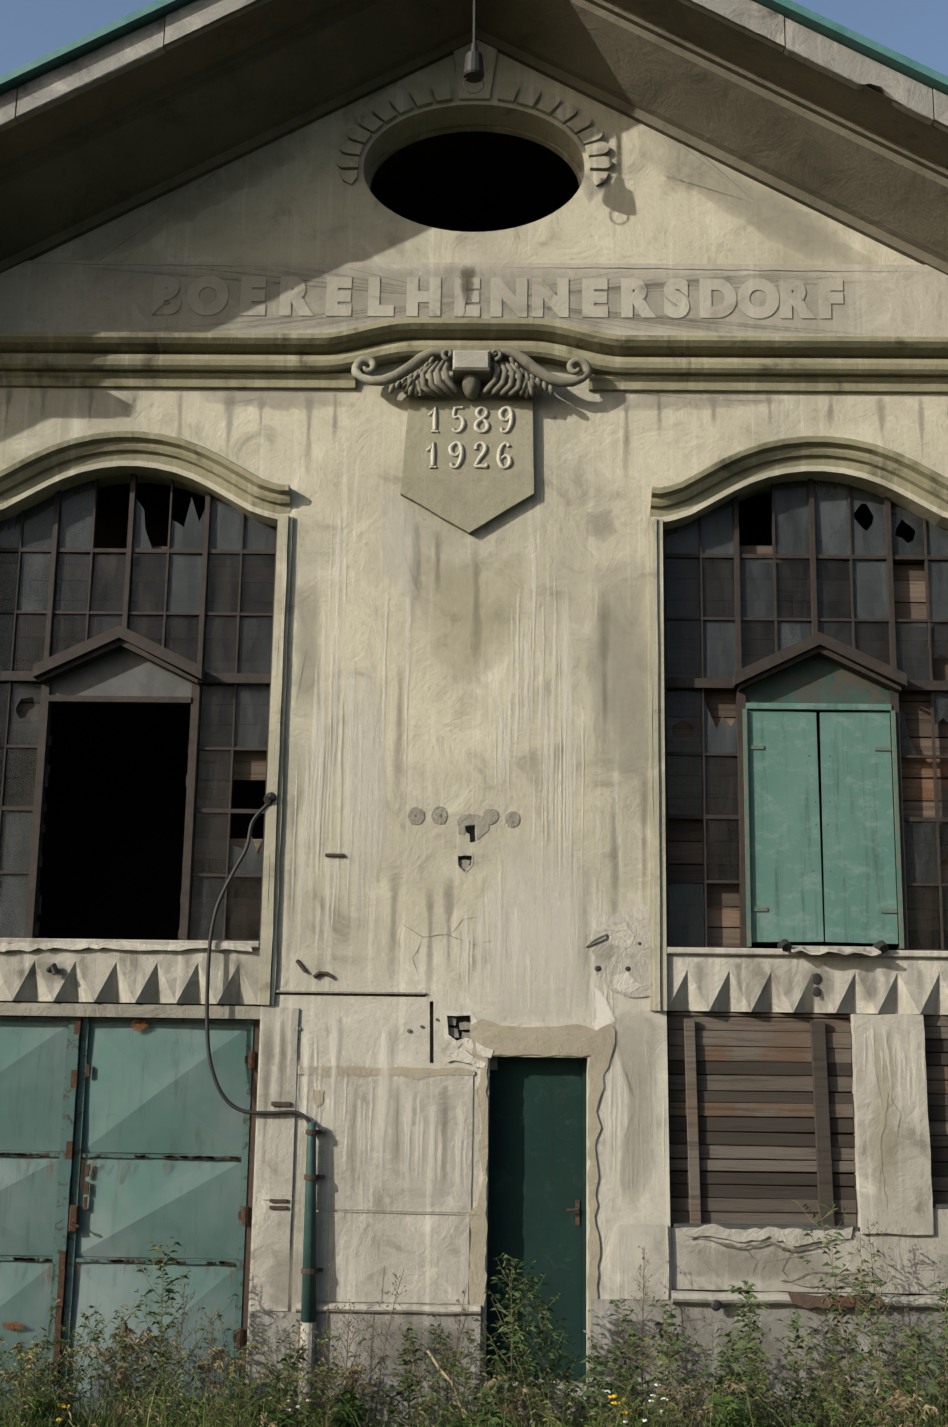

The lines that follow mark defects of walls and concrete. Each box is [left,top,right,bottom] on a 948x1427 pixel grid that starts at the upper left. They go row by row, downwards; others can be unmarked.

leakage [293,677,384,848]
leakage [465,632,615,1030]
rust [131,1019,148,1032]
spalling [681,1224,882,1309]